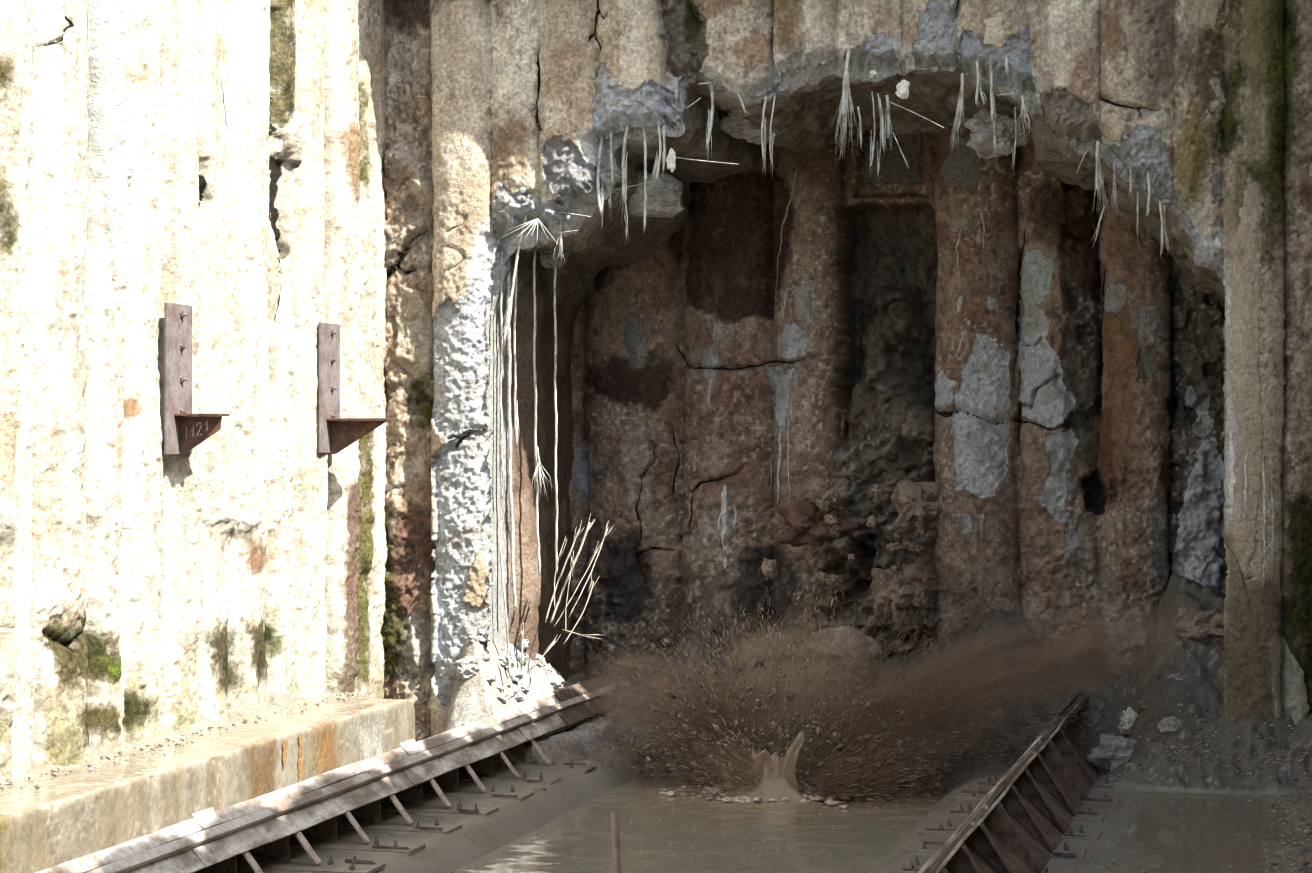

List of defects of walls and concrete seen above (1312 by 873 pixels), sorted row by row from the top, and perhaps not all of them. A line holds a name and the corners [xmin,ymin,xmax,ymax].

crack [588,0,605,58]
leakage [1184,29,1223,116]
crack [387,231,427,278]
crack [676,344,832,375]
spalling [394,0,1265,707]
crack [635,425,744,592]
crack [45,634,74,651]